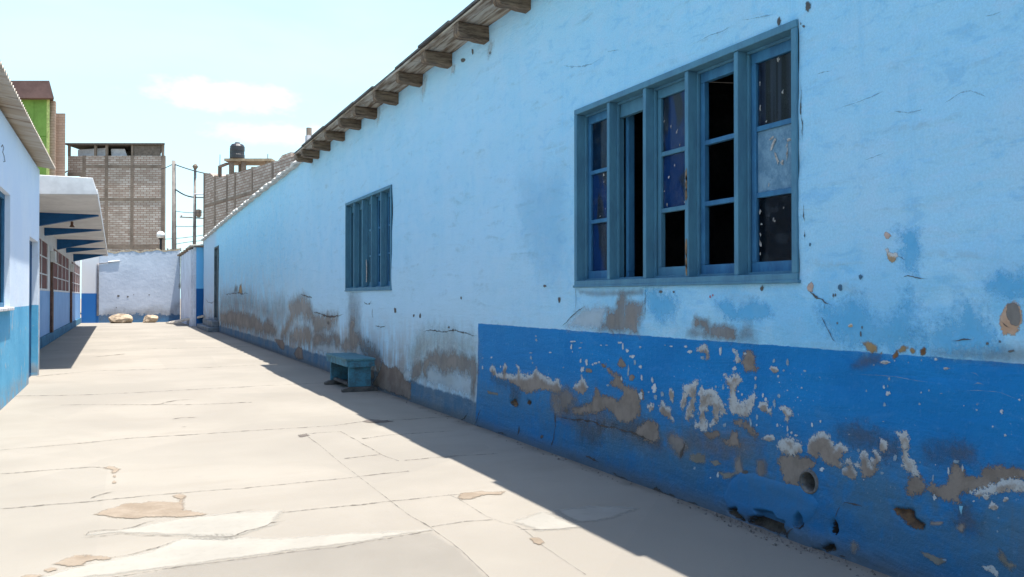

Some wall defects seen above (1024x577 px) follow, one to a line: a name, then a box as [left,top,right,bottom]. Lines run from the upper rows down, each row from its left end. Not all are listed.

spalling [999,302,1022,336]
leakage [412,351,478,395]
peeling [482,335,1024,530]
spalling [97,494,206,518]
spalling [729,508,804,538]
spalling [824,507,847,558]
peeling [983,550,1016,577]